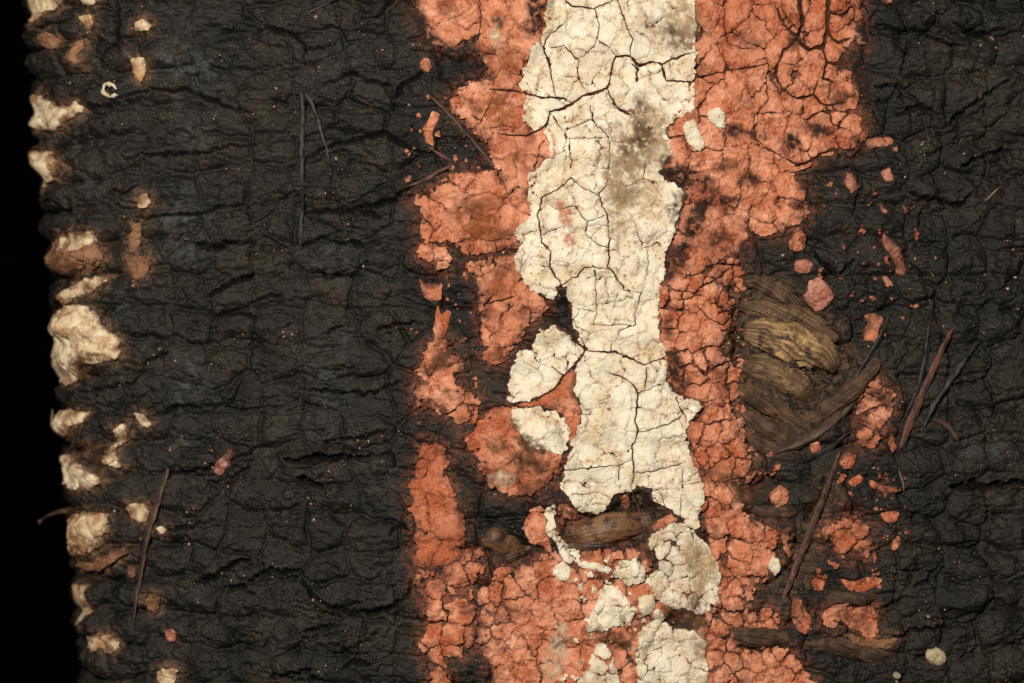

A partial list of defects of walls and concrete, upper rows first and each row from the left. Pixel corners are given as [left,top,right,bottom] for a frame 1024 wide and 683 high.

peeling [28,0,96,65]
peeling [29,95,86,132]
peeling [29,151,61,188]
crack [446,240,515,261]
crack [474,0,855,510]
peeling [44,230,123,386]
peeling [405,0,919,683]
peeling [52,409,89,440]
peeling [101,413,152,469]
peeling [59,455,103,491]
peeling [67,512,137,577]
peeling [126,503,168,534]